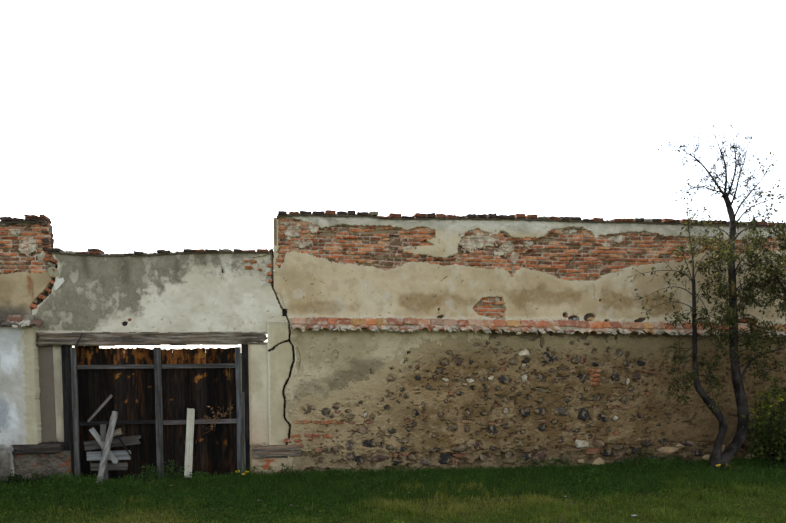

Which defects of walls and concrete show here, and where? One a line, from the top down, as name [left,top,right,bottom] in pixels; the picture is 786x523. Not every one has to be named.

spalling [0,222,57,274]
spalling [236,216,786,283]
spalling [473,297,506,319]
crack [264,248,301,444]
spalling [284,332,786,473]